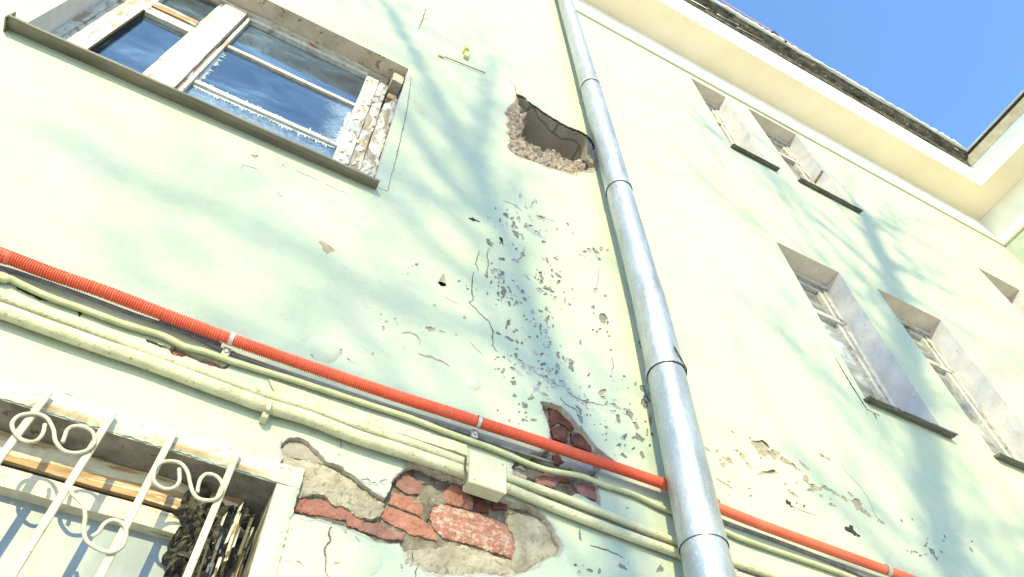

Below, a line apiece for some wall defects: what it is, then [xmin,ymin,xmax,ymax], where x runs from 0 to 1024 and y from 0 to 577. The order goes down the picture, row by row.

spalling [502,92,599,176]
crack [446,250,498,353]
flaking render [278,193,654,577]
crack [835,358,880,419]
peeling [704,436,885,524]